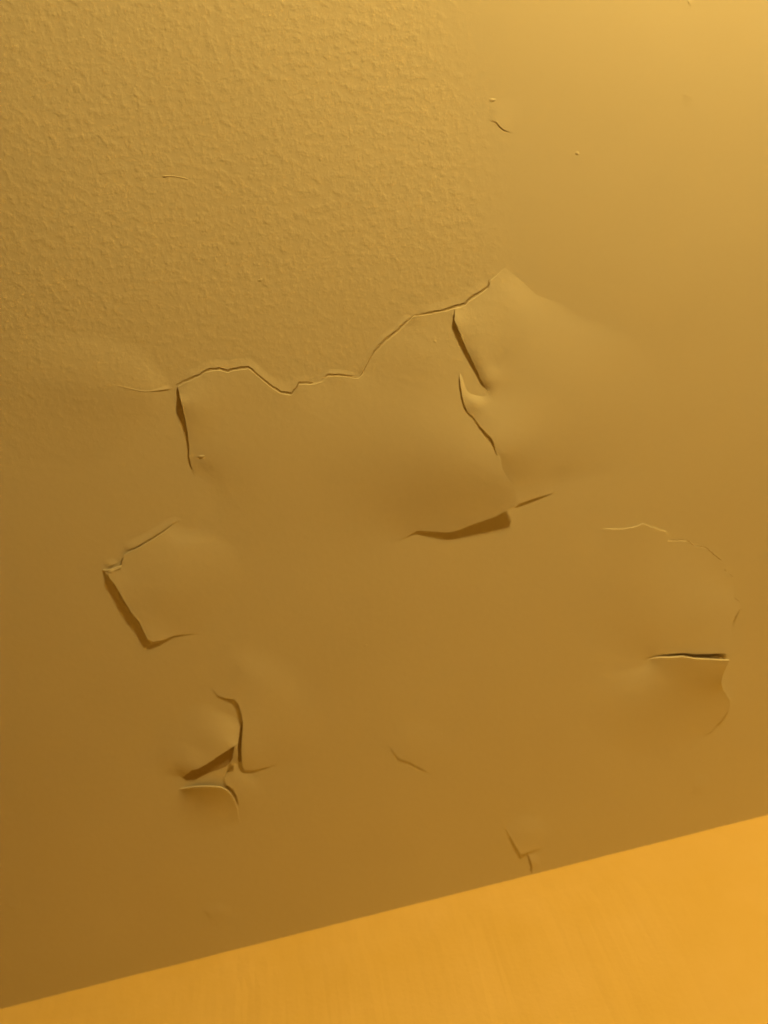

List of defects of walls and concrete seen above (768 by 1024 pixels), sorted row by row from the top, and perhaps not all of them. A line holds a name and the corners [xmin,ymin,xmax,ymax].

peeling [104,307,518,642]
peeling [156,644,323,835]
peeling [565,524,741,760]